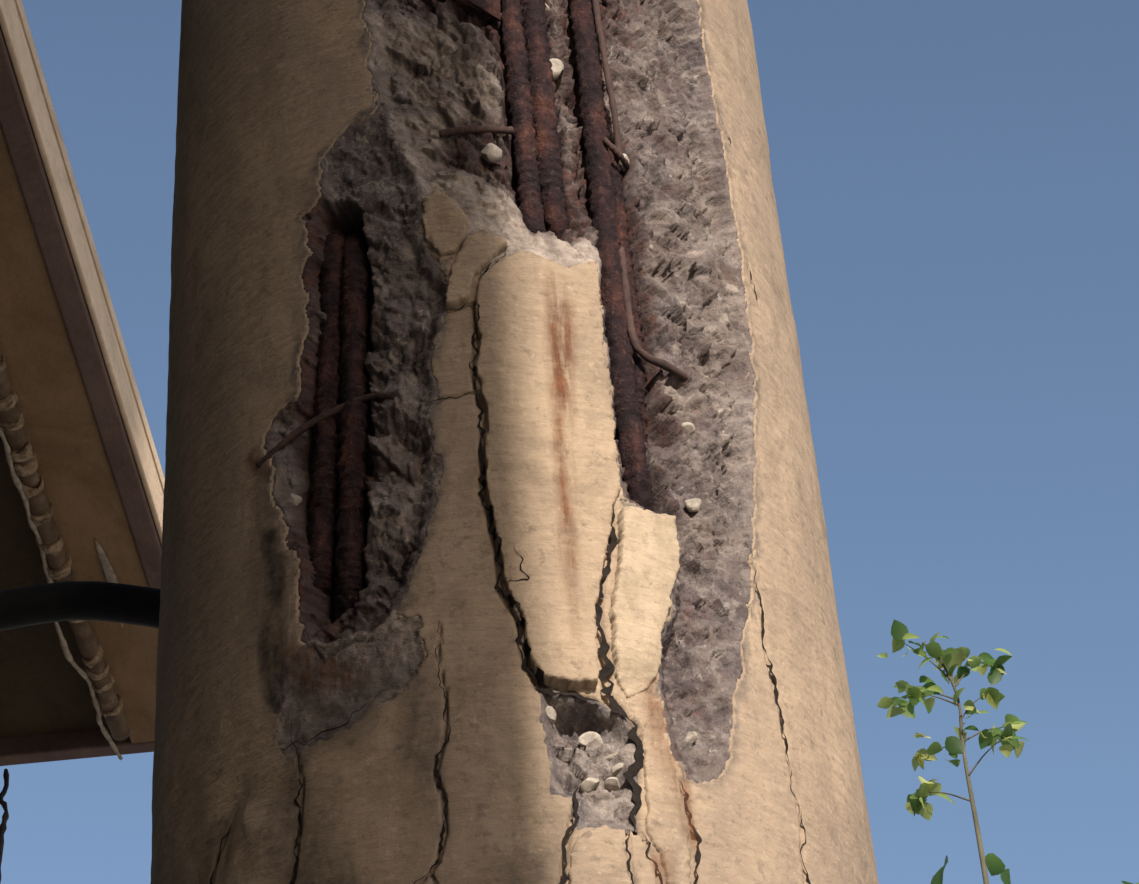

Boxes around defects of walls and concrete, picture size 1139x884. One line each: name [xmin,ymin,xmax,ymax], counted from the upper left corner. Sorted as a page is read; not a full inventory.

spalling [255,0,760,784]
crack [432,245,663,884]
rust [560,457,569,524]
crack [209,814,237,884]
crack [277,682,396,884]
crack [414,621,451,884]
spalling [534,684,639,834]
crack [680,781,702,884]
crack [747,535,811,884]